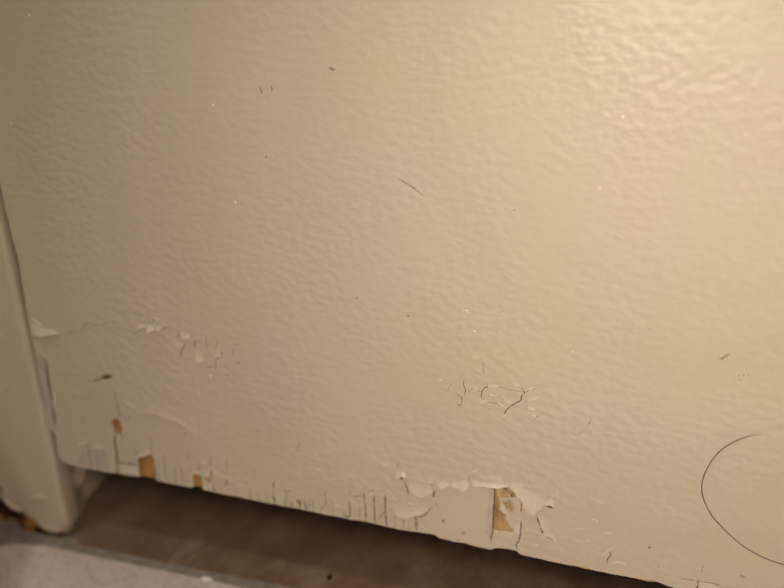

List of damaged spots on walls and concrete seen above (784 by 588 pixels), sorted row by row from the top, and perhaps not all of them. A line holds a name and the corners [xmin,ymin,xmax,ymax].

crack [439,355,541,419]
peeling [74,439,156,486]
peeling [191,466,226,492]
crack [235,482,396,527]
peeling [371,450,570,550]